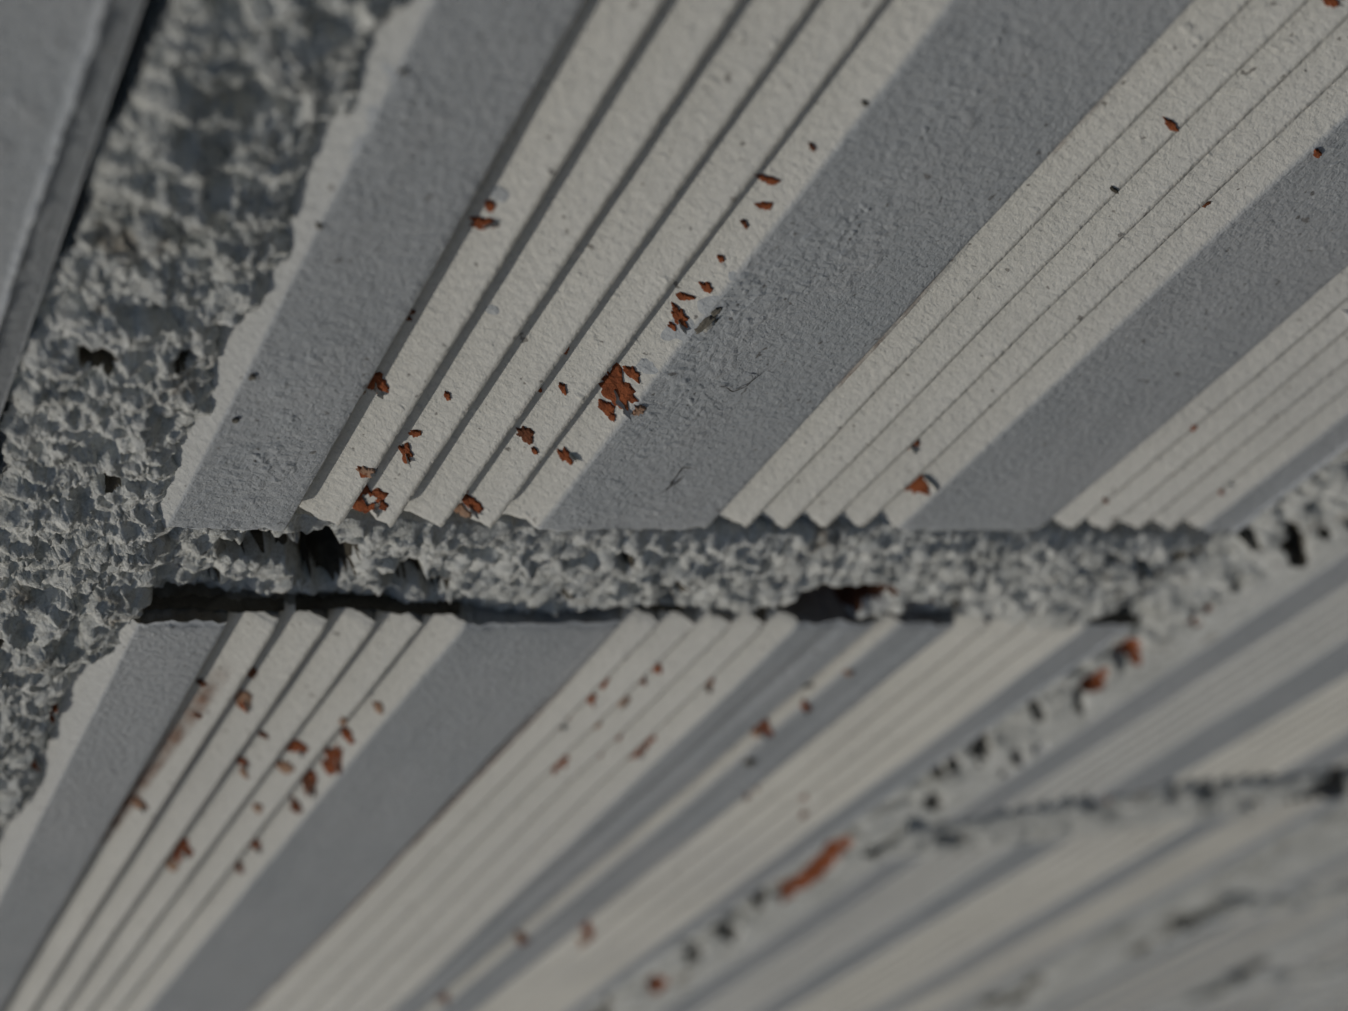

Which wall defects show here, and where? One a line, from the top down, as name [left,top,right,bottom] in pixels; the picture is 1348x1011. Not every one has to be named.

crack [144,593,460,615]
crack [626,604,683,613]
crack [1069,615,1141,624]